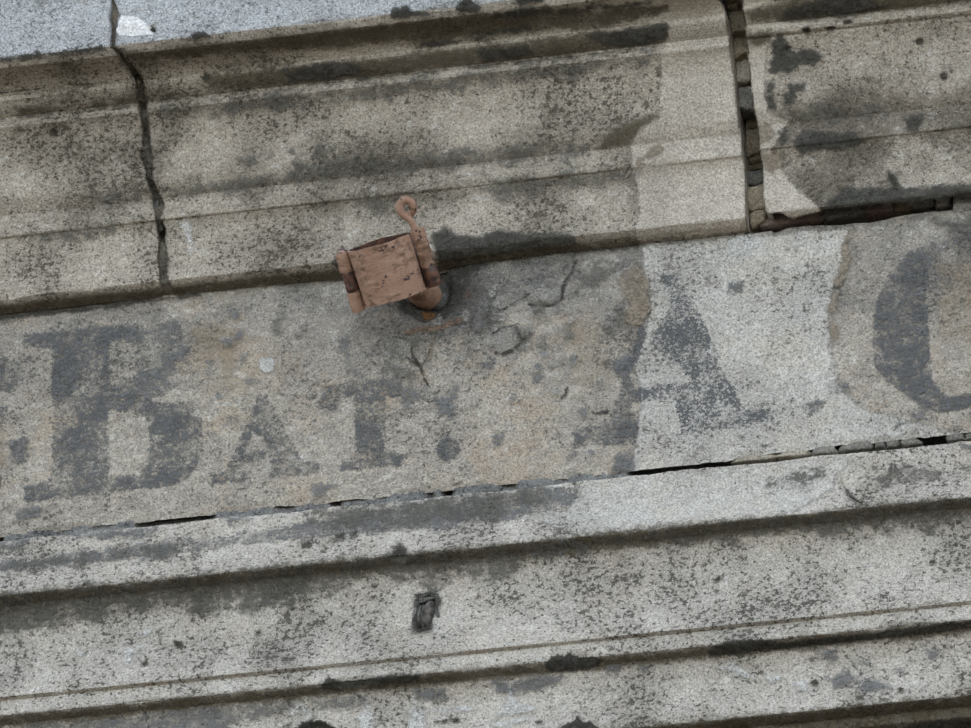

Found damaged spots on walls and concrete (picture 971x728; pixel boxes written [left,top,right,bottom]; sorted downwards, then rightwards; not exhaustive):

damp [0,44,104,62]
damp [13,104,56,114]
damp [26,191,141,242]
damp [125,0,971,474]
crack [487,260,577,316]
crack [390,337,433,385]
damp [0,457,971,611]